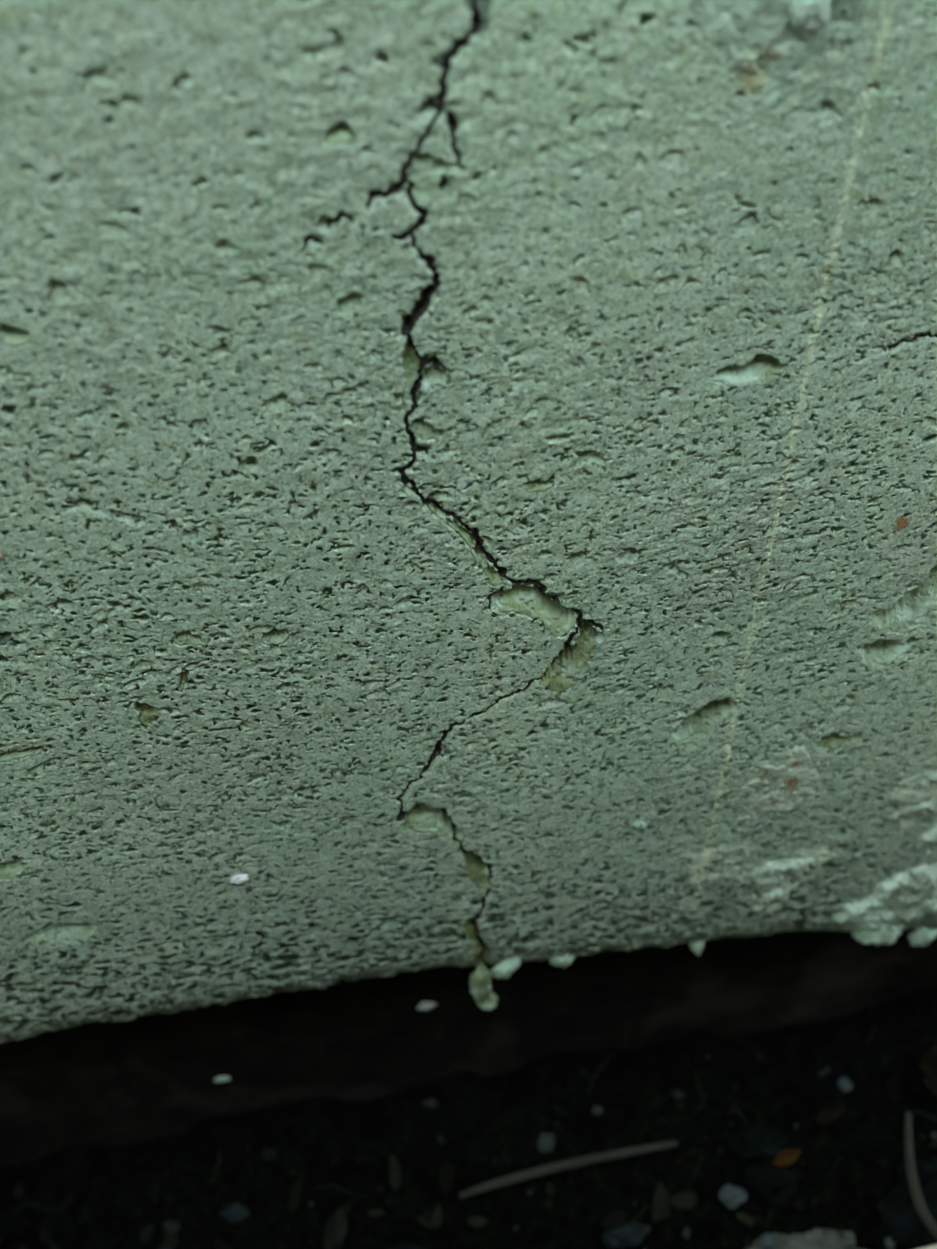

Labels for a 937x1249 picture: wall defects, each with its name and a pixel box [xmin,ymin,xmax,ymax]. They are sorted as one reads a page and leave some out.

crack [300,0,604,961]
spalling [426,502,604,699]
spalling [860,565,937,671]